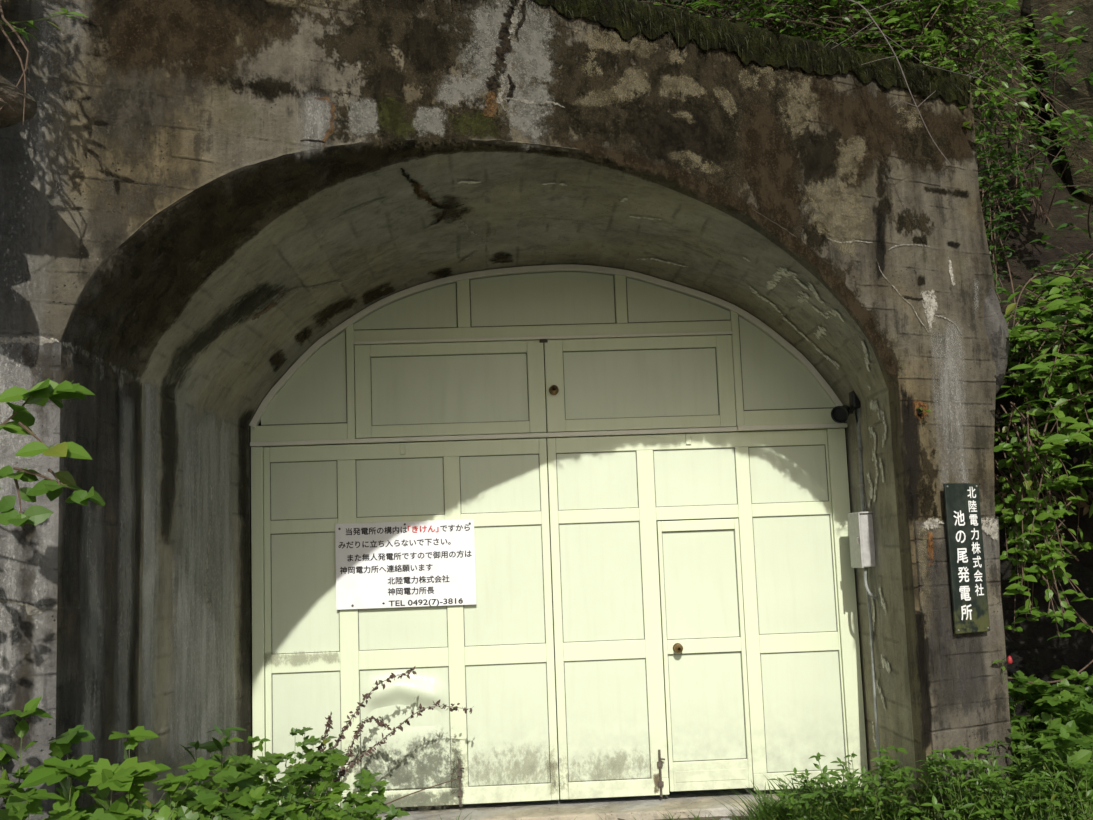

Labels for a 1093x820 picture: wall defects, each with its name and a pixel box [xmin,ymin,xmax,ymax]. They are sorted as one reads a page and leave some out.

crack [483,0,565,117]
crack [400,168,489,245]
water stain [0,385,13,437]
water stain [0,336,64,387]
water stain [63,0,976,764]
water stain [981,517,998,539]
water stain [0,513,36,750]